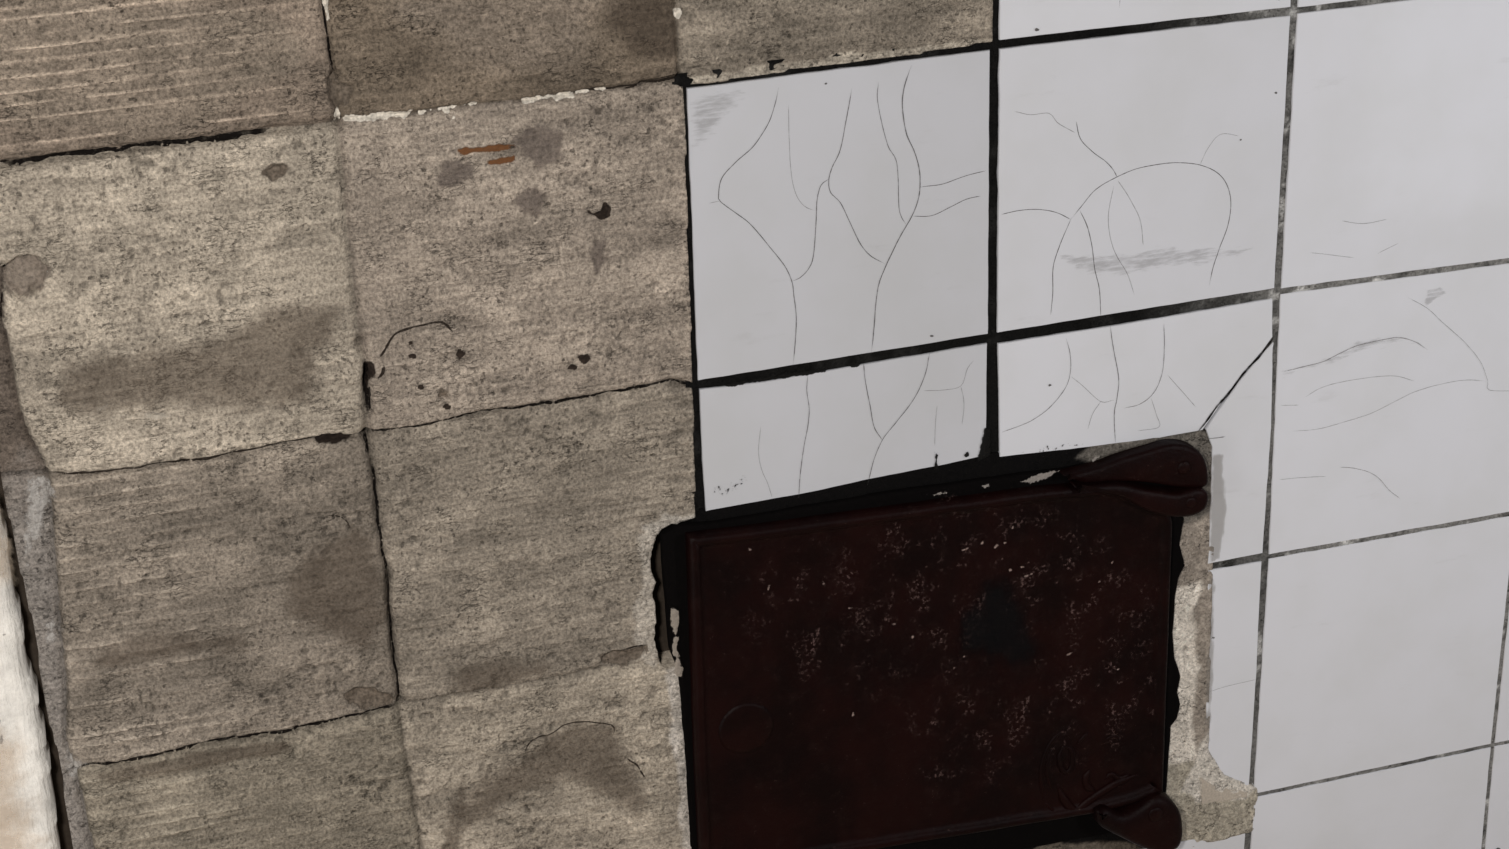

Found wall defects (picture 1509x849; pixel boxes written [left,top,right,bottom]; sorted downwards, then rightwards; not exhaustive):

corrosion [458,144,515,165]
crack [718,76,1231,490]
crack [1198,337,1274,439]